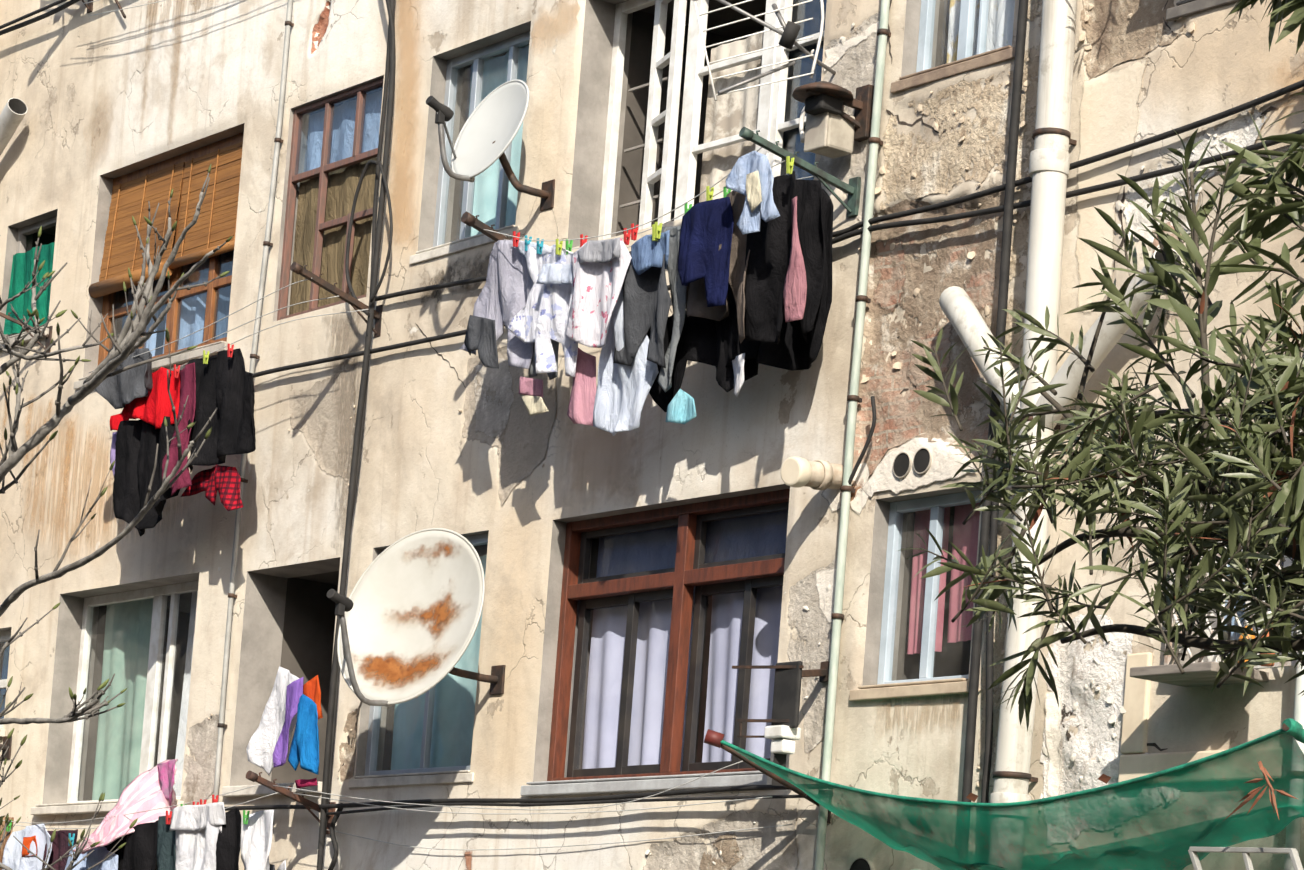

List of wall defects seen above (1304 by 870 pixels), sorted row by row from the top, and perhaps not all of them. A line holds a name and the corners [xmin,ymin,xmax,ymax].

flaking render [311,0,331,54]
peeling [811,12,880,116]
peeling [1027,0,1043,28]
peeling [1116,97,1267,253]
flaking render [818,44,1040,514]
peeling [458,346,556,506]
peeling [976,514,1013,790]
peeling [1039,614,1134,799]
peeling [643,808,798,870]